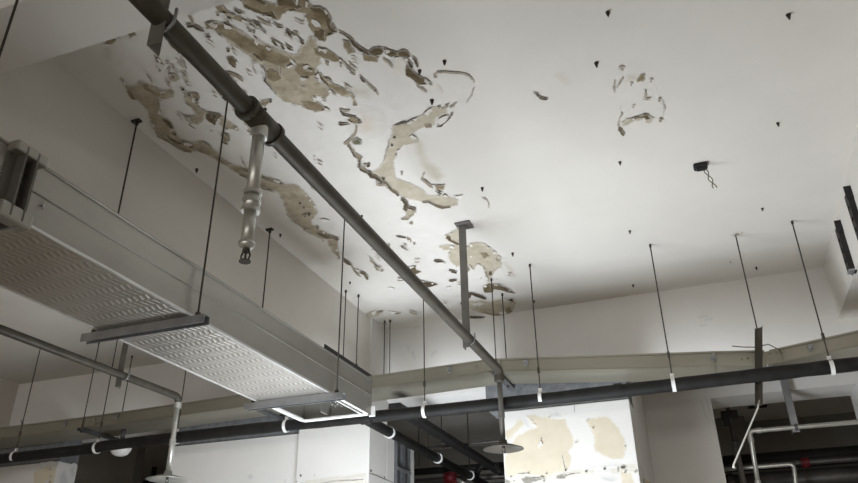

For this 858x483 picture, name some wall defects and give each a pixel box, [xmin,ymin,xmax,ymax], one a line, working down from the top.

peeling [73,27,252,193]
peeling [612,66,665,136]
peeling [177,0,539,327]
peeling [502,382,630,397]
peeling [504,396,640,483]